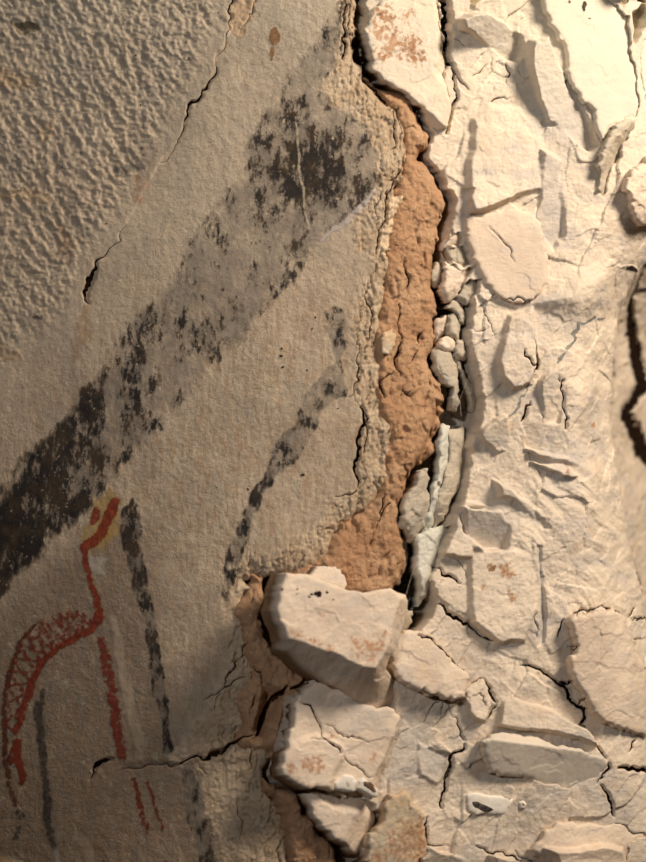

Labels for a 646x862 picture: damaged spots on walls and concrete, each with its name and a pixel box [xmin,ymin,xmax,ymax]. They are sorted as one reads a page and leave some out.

crack [161,0,256,163]
flaking render [230,0,254,37]
crack [83,225,126,304]
flaking render [377,196,403,256]
spalling [427,207,549,413]
crack [621,264,646,465]
spalling [392,423,466,630]
crack [90,643,370,779]
crack [422,688,465,846]
crack [473,678,496,721]
crack [522,664,646,816]
crack [534,605,646,651]